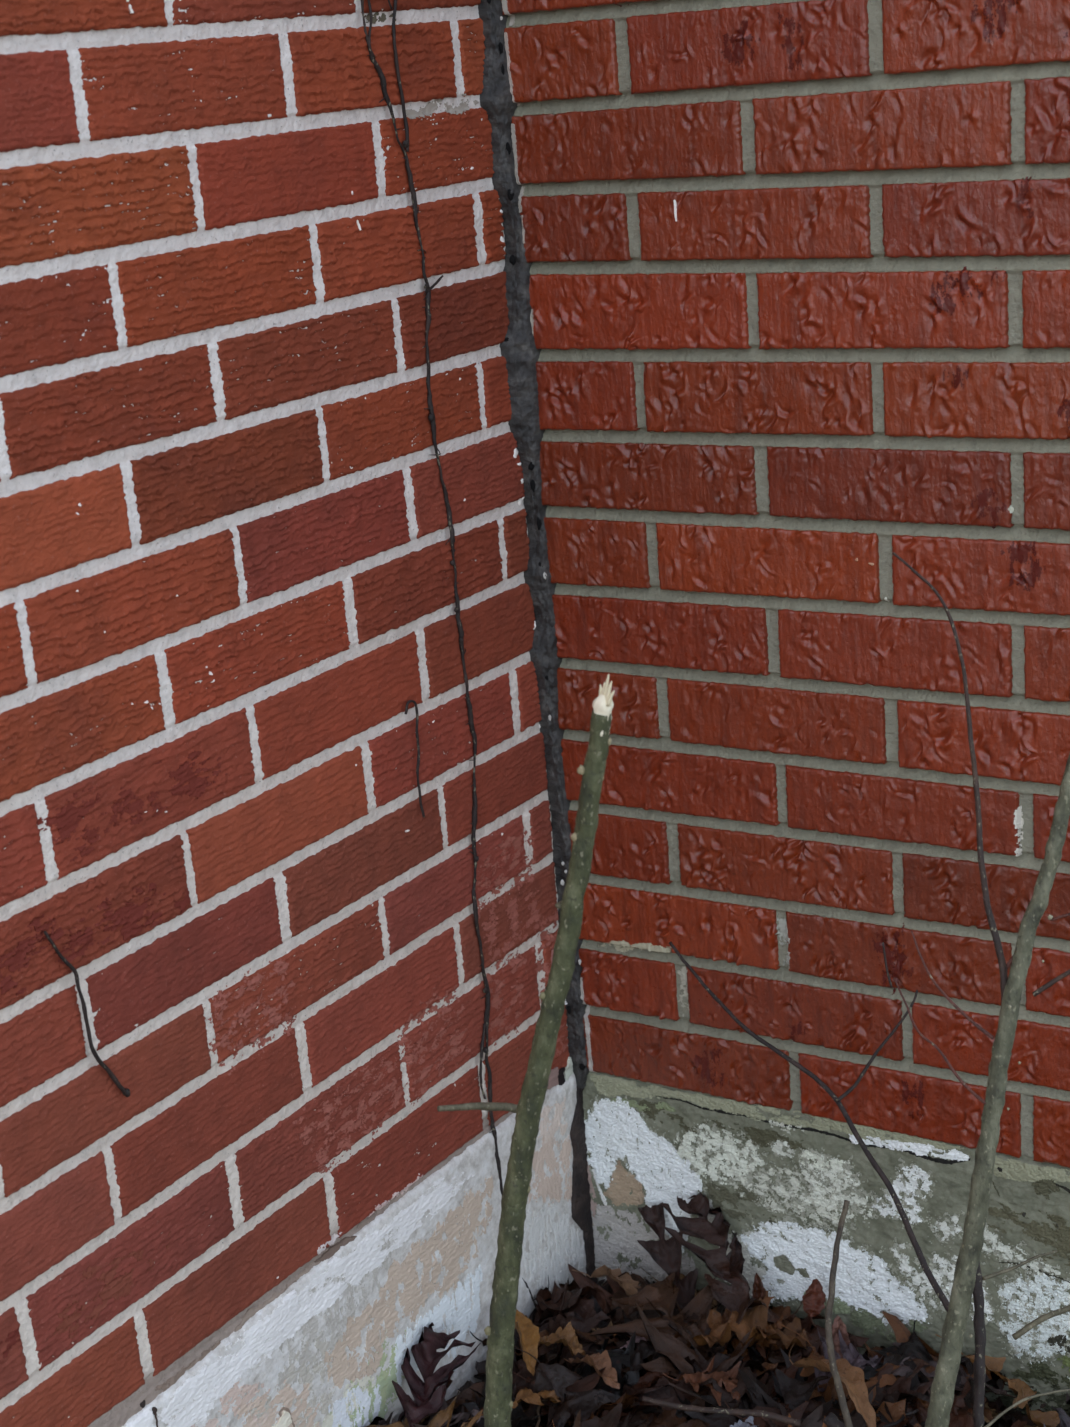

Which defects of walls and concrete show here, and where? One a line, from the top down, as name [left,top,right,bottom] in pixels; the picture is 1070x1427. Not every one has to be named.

damp [638,1099,806,1150]
damp [849,1134,970,1162]
damp [706,1183,783,1224]
peeling [584,1094,965,1332]
spalling [1031,1179,1060,1200]
damp [987,1202,1070,1278]
peeling [969,1223,1070,1390]
damp [992,1376,1070,1415]